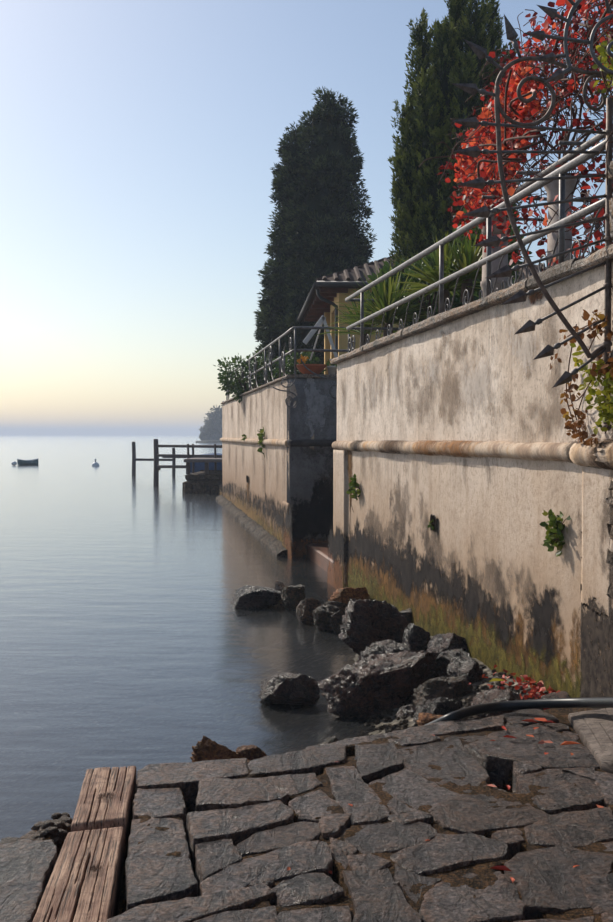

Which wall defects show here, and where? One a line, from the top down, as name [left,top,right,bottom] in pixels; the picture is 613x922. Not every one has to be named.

leakage [419,333,493,424]
leakage [219,482,293,543]
leakage [342,519,560,665]
peeling [579,480,613,698]